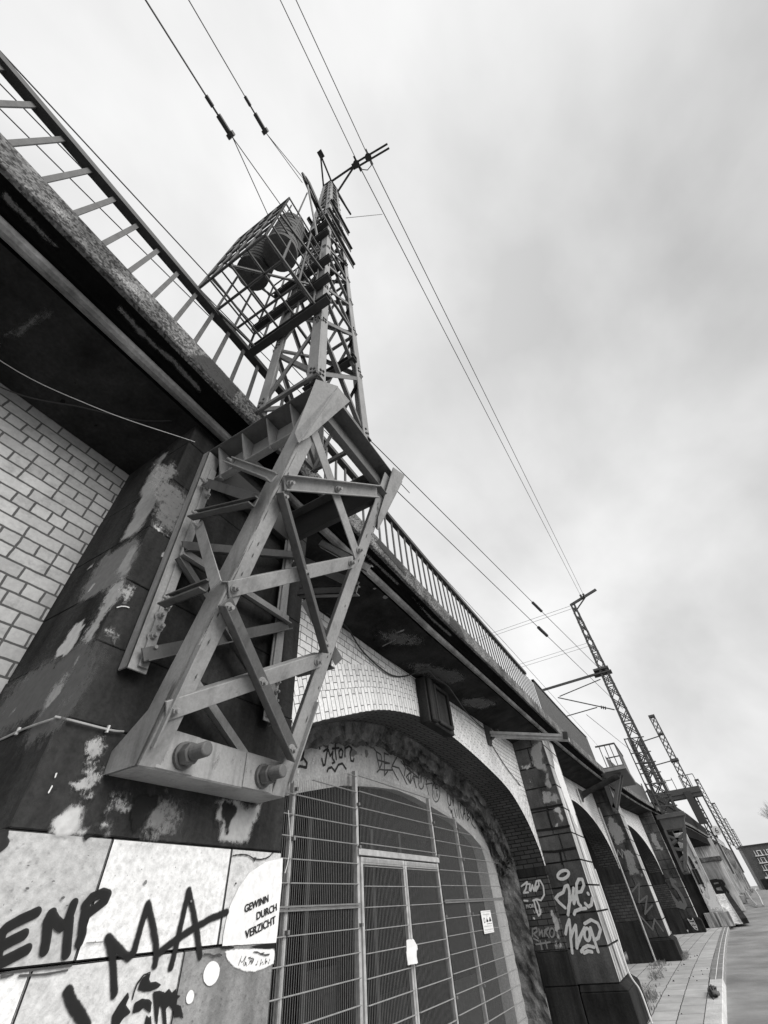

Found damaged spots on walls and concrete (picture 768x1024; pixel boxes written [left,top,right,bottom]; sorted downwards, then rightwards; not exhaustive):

peeling [71,737,105,798]
peeling [531,741,559,804]
spalling [304,721,551,1024]